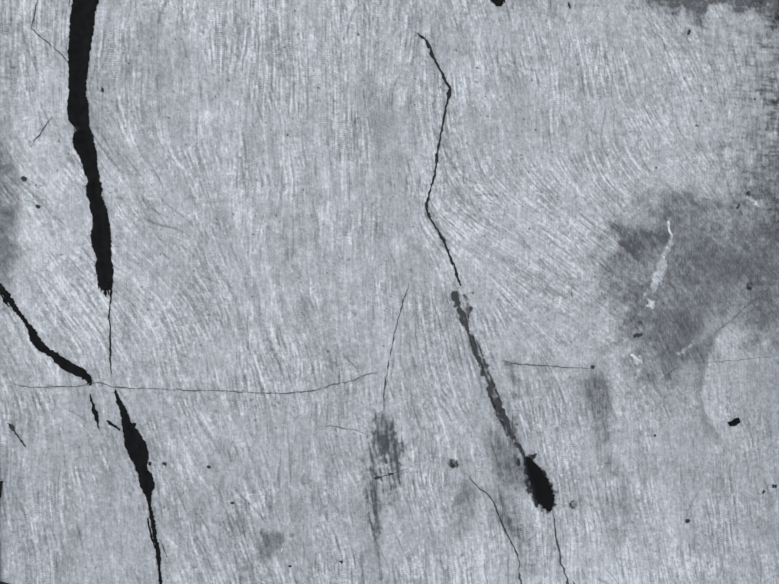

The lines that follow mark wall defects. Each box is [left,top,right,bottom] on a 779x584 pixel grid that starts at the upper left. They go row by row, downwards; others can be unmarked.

crack [0,0,409,584]
crack [417,33,593,466]
crack [468,475,522,584]
crack [553,514,575,584]